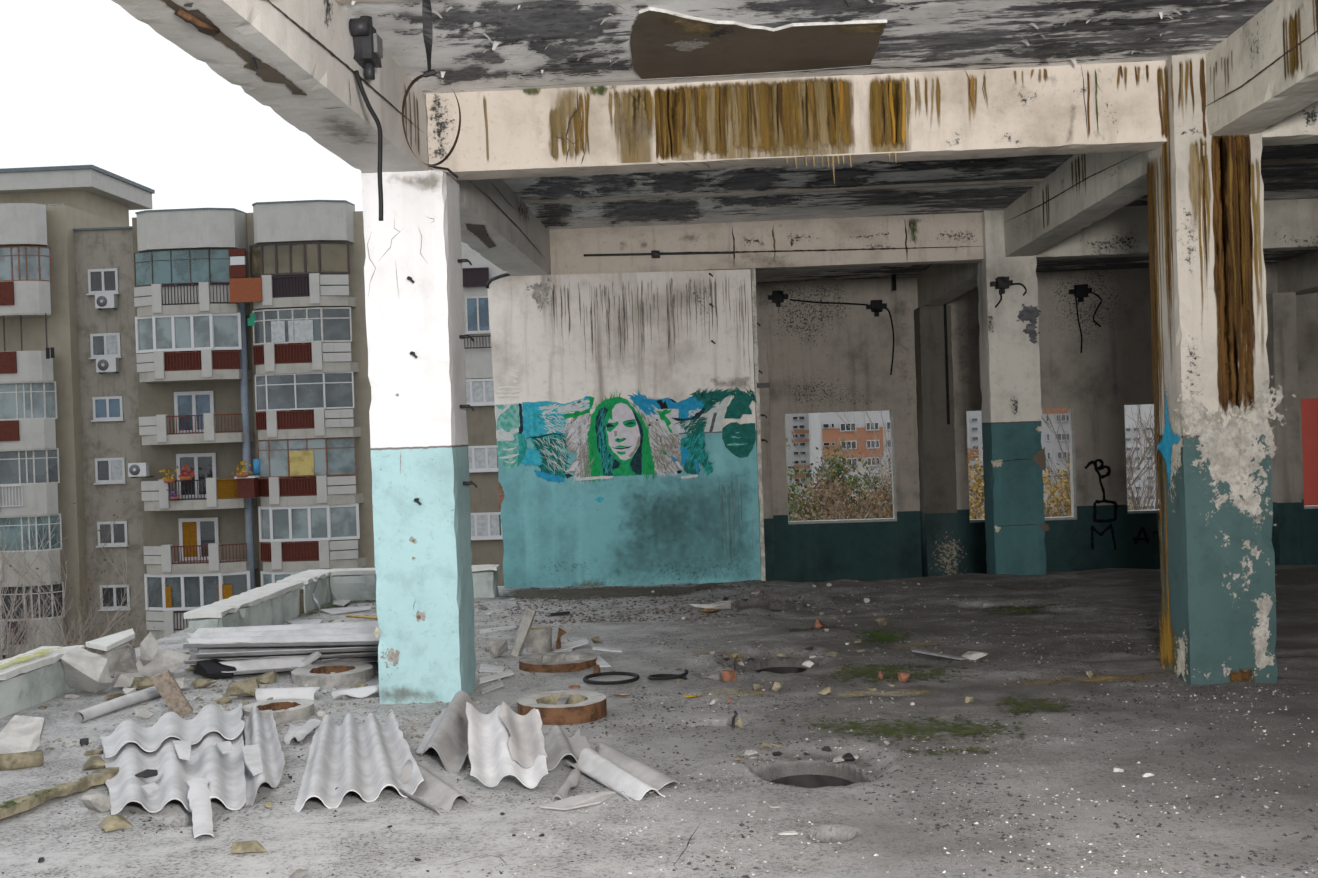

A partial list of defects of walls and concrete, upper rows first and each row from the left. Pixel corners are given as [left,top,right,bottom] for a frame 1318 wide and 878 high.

spalling [162,0,307,96]
spalling [378,0,931,85]
rust [1283,0,1318,80]
rust [550,90,590,170]
rust [609,79,853,169]
rust [869,76,940,153]
rust [1087,71,1099,135]
peeling [521,157,1017,228]
spalling [1016,304,1041,344]
rust [1117,52,1263,668]
peeling [1168,374,1297,684]